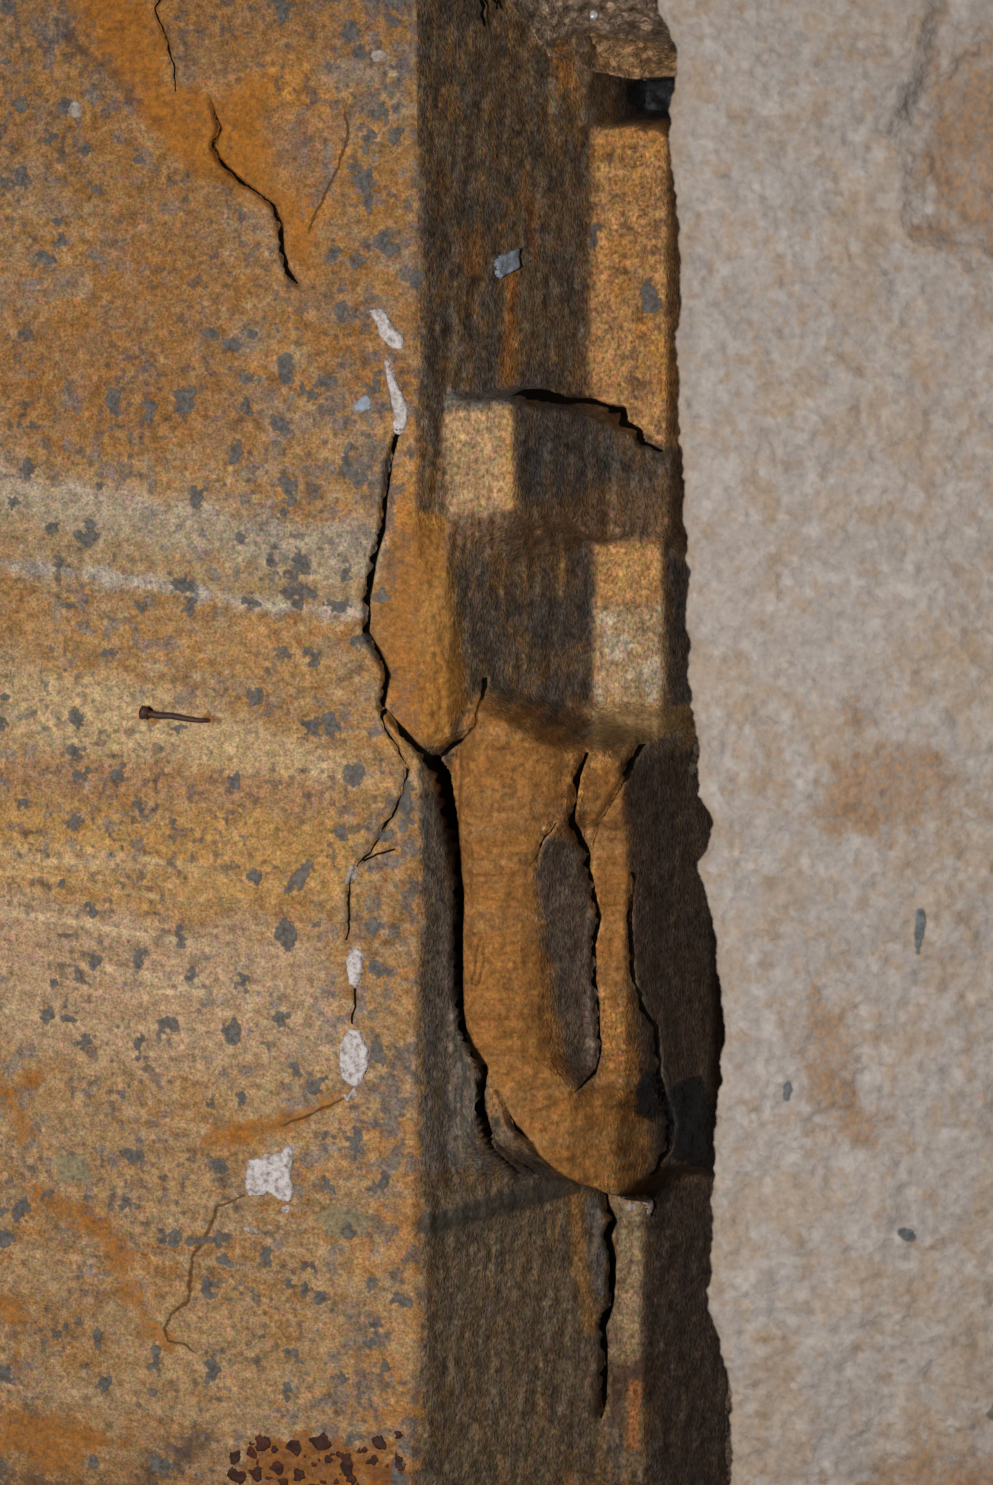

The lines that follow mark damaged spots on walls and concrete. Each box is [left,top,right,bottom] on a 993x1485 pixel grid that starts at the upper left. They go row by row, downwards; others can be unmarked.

crack [479,0,498,26]
crack [154,0,349,284]
crack [345,434,536,1174]
crack [535,744,675,1175]
crack [285,1098,345,1125]
crack [164,1195,244,1352]
crack [599,1192,617,1418]
corrosion [227,1431,408,1485]